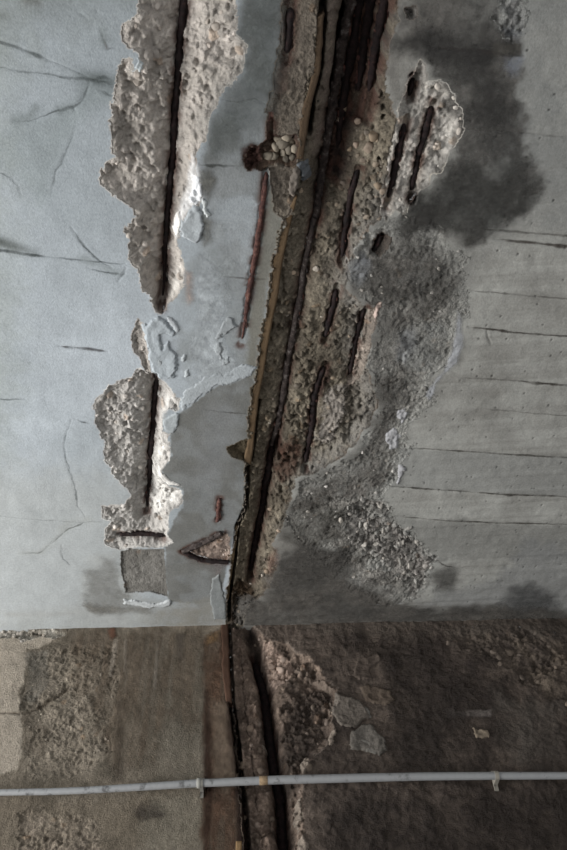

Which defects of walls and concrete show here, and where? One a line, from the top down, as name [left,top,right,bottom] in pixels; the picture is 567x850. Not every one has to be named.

damp [395,0,542,246]
rust [241,144,261,169]
crack [500,230,567,248]
crack [479,328,567,337]
spalling [93,0,471,850]
damp [234,506,567,625]
rust [229,578,254,624]